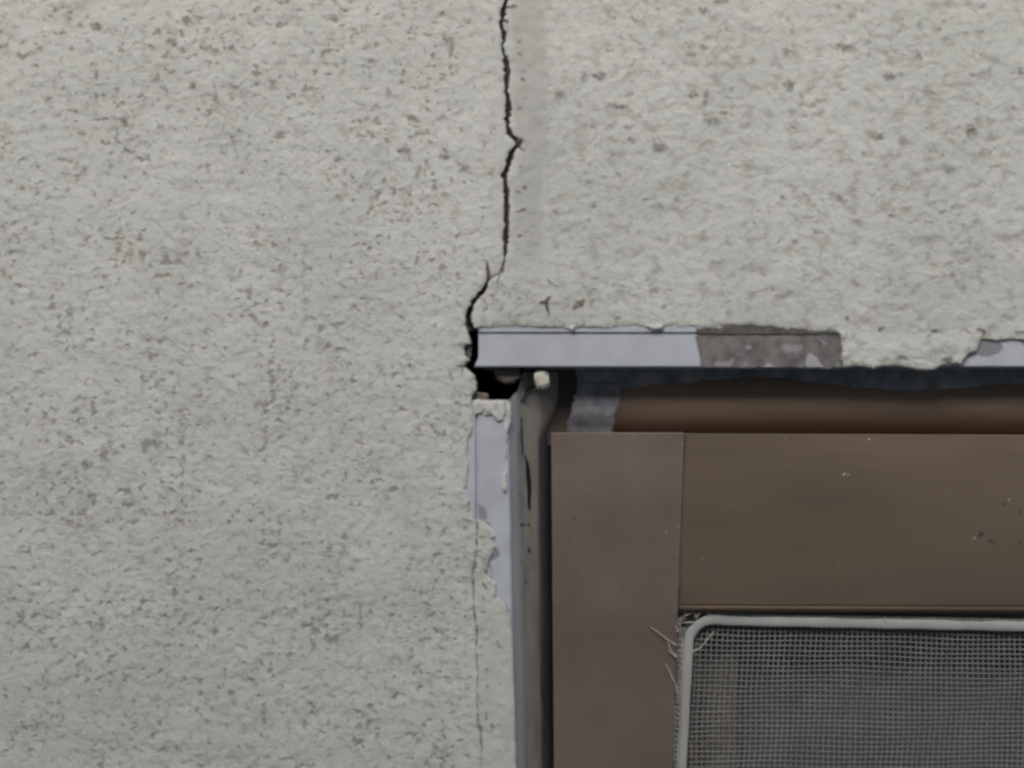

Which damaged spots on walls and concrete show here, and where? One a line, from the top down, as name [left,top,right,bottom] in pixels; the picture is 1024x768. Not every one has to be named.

crack [465,0,525,331]